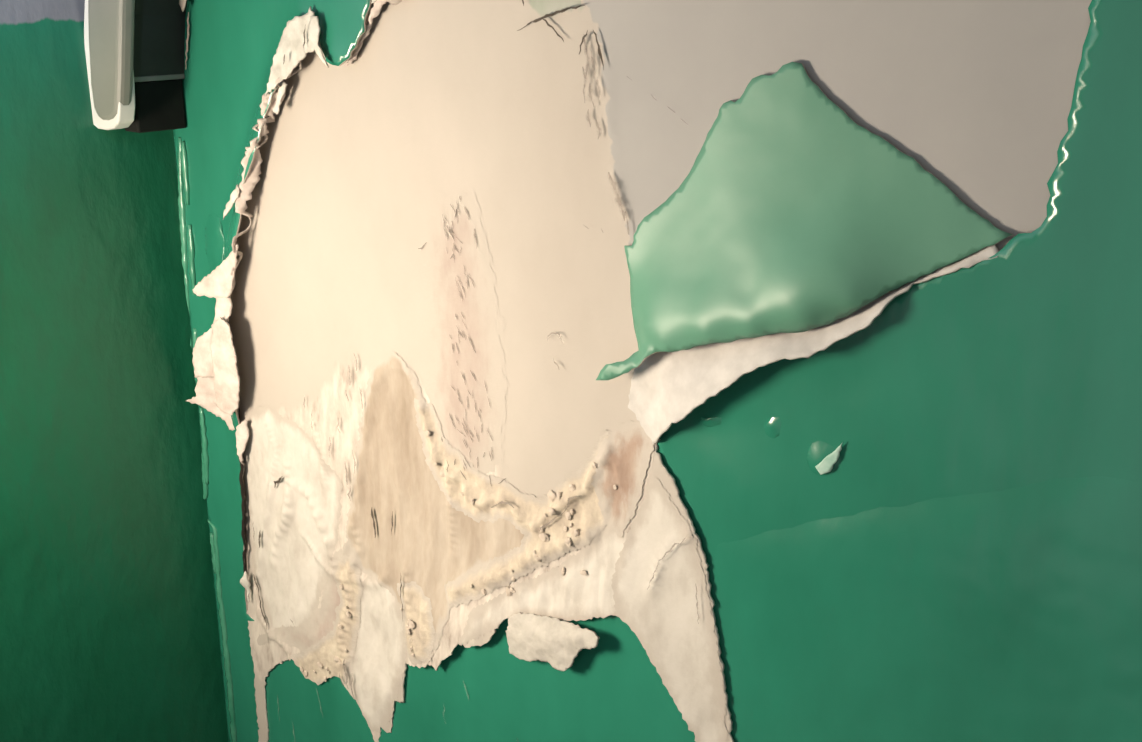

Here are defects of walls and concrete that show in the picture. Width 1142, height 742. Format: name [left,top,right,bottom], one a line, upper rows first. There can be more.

peeling [179,0,189,65]
peeling [186,0,1092,742]